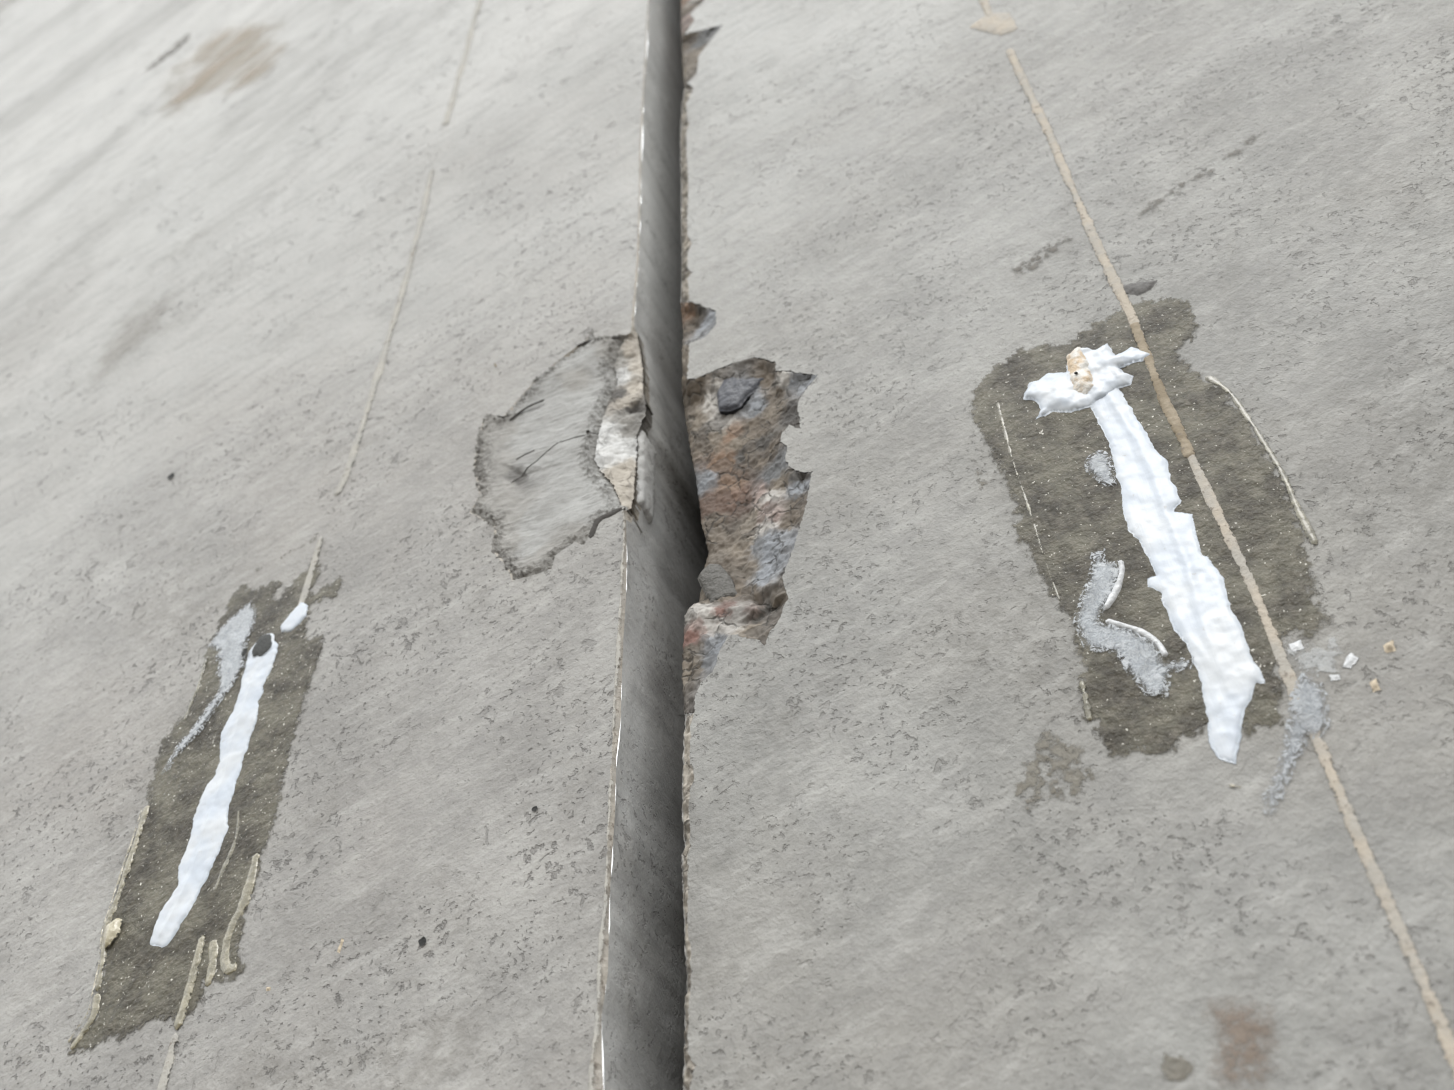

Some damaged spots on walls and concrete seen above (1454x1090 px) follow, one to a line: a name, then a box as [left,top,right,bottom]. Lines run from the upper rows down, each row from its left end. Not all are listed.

crack [577,336,621,347]
crack [509,399,544,421]
crack [511,430,599,483]
spalling [594,331,653,522]
crack [588,506,626,538]
spalling [680,0,817,1090]
water stain [969,297,1331,757]
water stain [67,560,342,1055]
water stain [1015,731,1095,810]